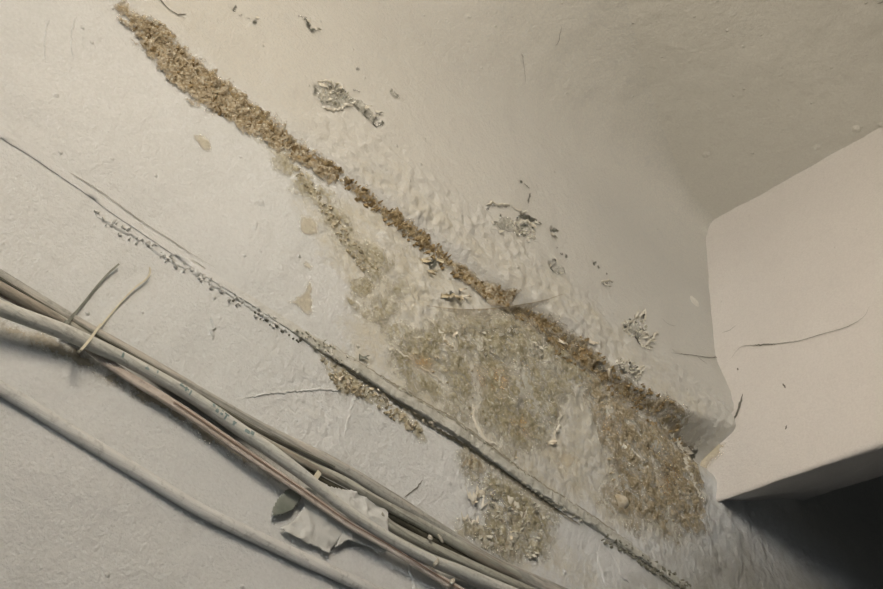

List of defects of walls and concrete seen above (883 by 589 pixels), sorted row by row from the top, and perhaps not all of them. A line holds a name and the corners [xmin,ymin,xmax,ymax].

peeling [314,79,384,128]
peeling [420,257,445,275]
peeling [487,180,567,274]
peeling [621,308,659,349]
crack [671,310,868,364]
damp [320,356,426,440]
flaking render [385,312,609,459]
flaking render [458,447,558,562]
damp [585,374,719,543]
peeling [681,446,704,488]